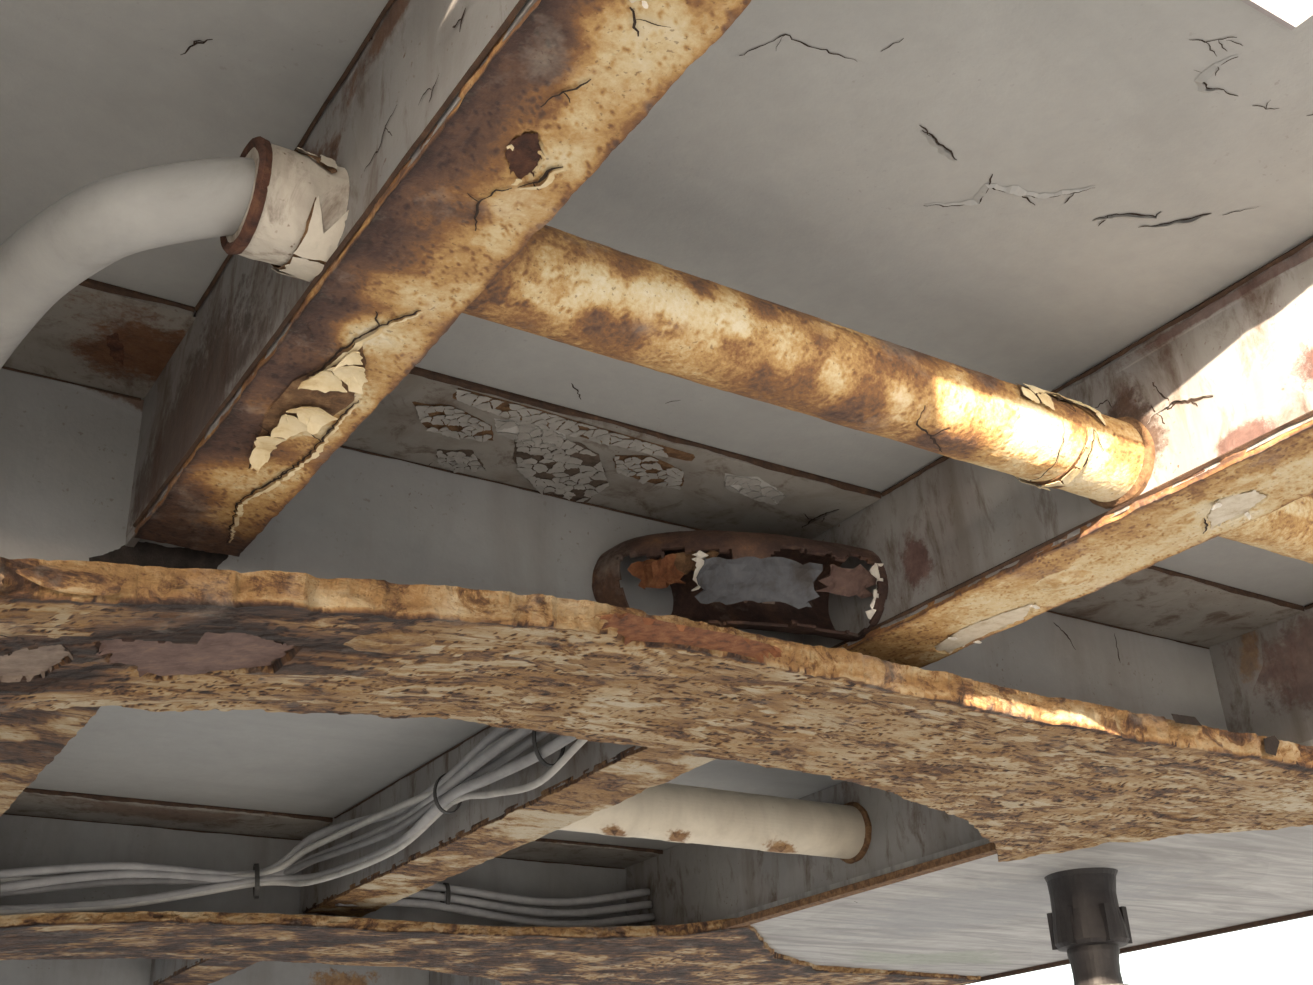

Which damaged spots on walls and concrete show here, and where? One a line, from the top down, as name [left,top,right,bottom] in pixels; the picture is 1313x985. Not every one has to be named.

crack [181,39,213,55]
crack [1194,37,1313,116]
rust [301,0,417,246]
crack [919,125,957,162]
crack [924,174,1257,228]
rust [0,136,313,596]
rust [1060,242,1313,495]
peeling [249,346,368,473]
peeling [412,388,695,502]
spalling [0,645,74,683]
spalling [96,632,294,677]
rust [659,819,695,843]